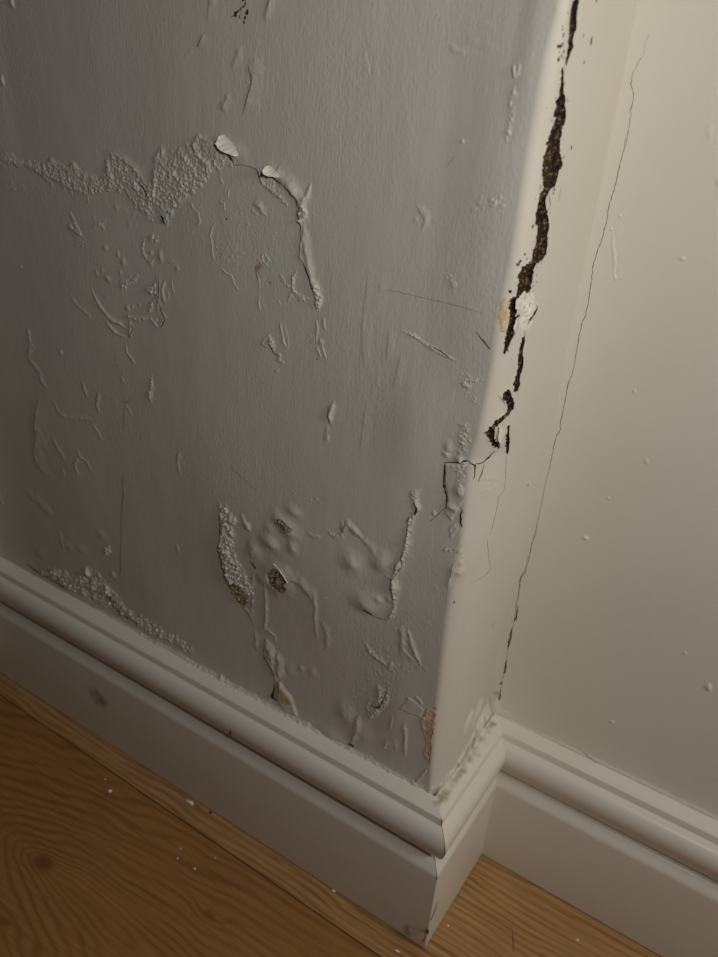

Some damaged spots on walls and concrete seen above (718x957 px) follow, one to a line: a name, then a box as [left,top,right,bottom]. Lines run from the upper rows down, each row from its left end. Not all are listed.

peeling [69,271,170,339]
peeling [215,132,327,360]
crack [387,0,578,583]
crack [499,34,649,701]
flaking render [274,519,292,533]
spalling [431,418,472,554]
spalling [27,564,196,655]
flaking render [230,583,253,610]
flaking render [266,569,287,594]
peeling [262,637,320,717]
peeling [312,619,439,763]